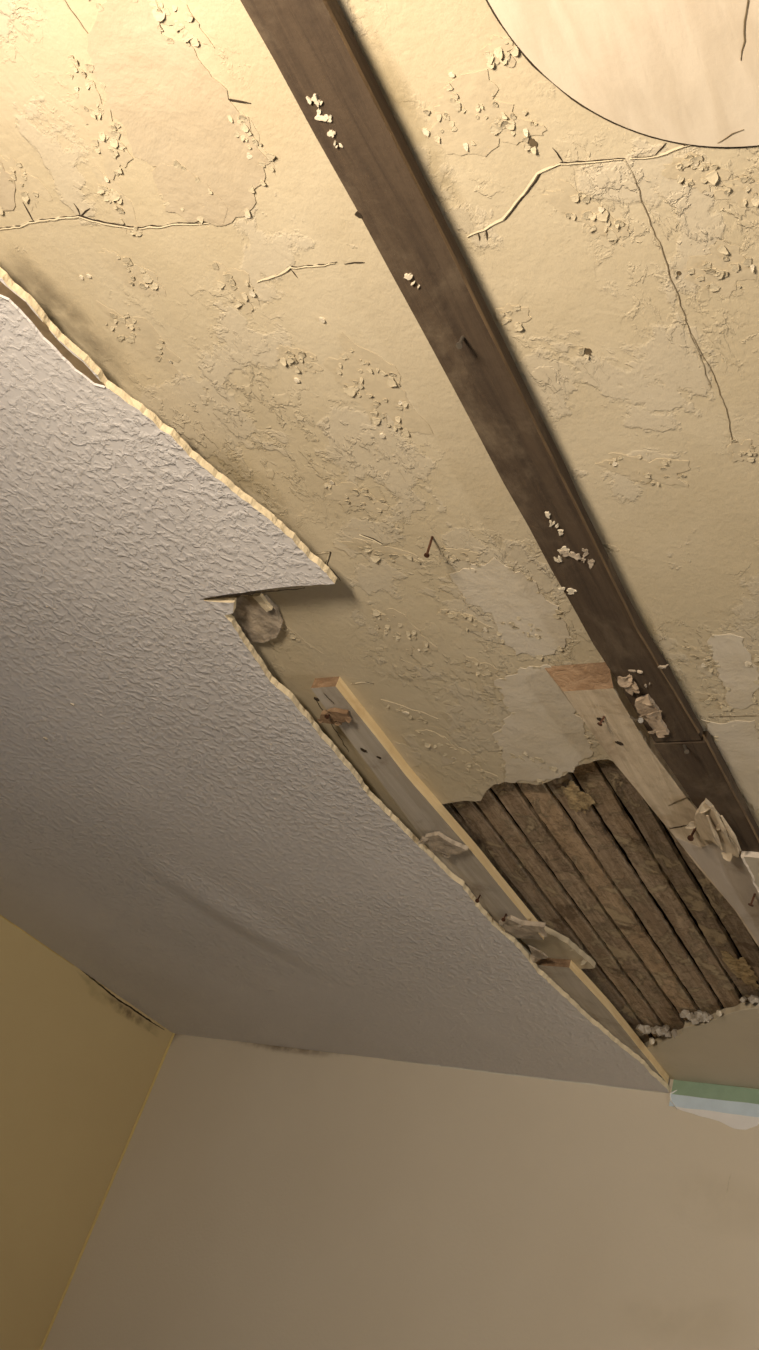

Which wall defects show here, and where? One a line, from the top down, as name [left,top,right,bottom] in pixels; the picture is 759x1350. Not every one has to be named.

crack [0,203,210,231]
crack [467,129,744,462]
peeling [450,557,593,814]
peeling [701,634,759,810]
peeling [685,803,711,829]
spalling [731,958,759,1007]
spalling [635,1010,714,1039]